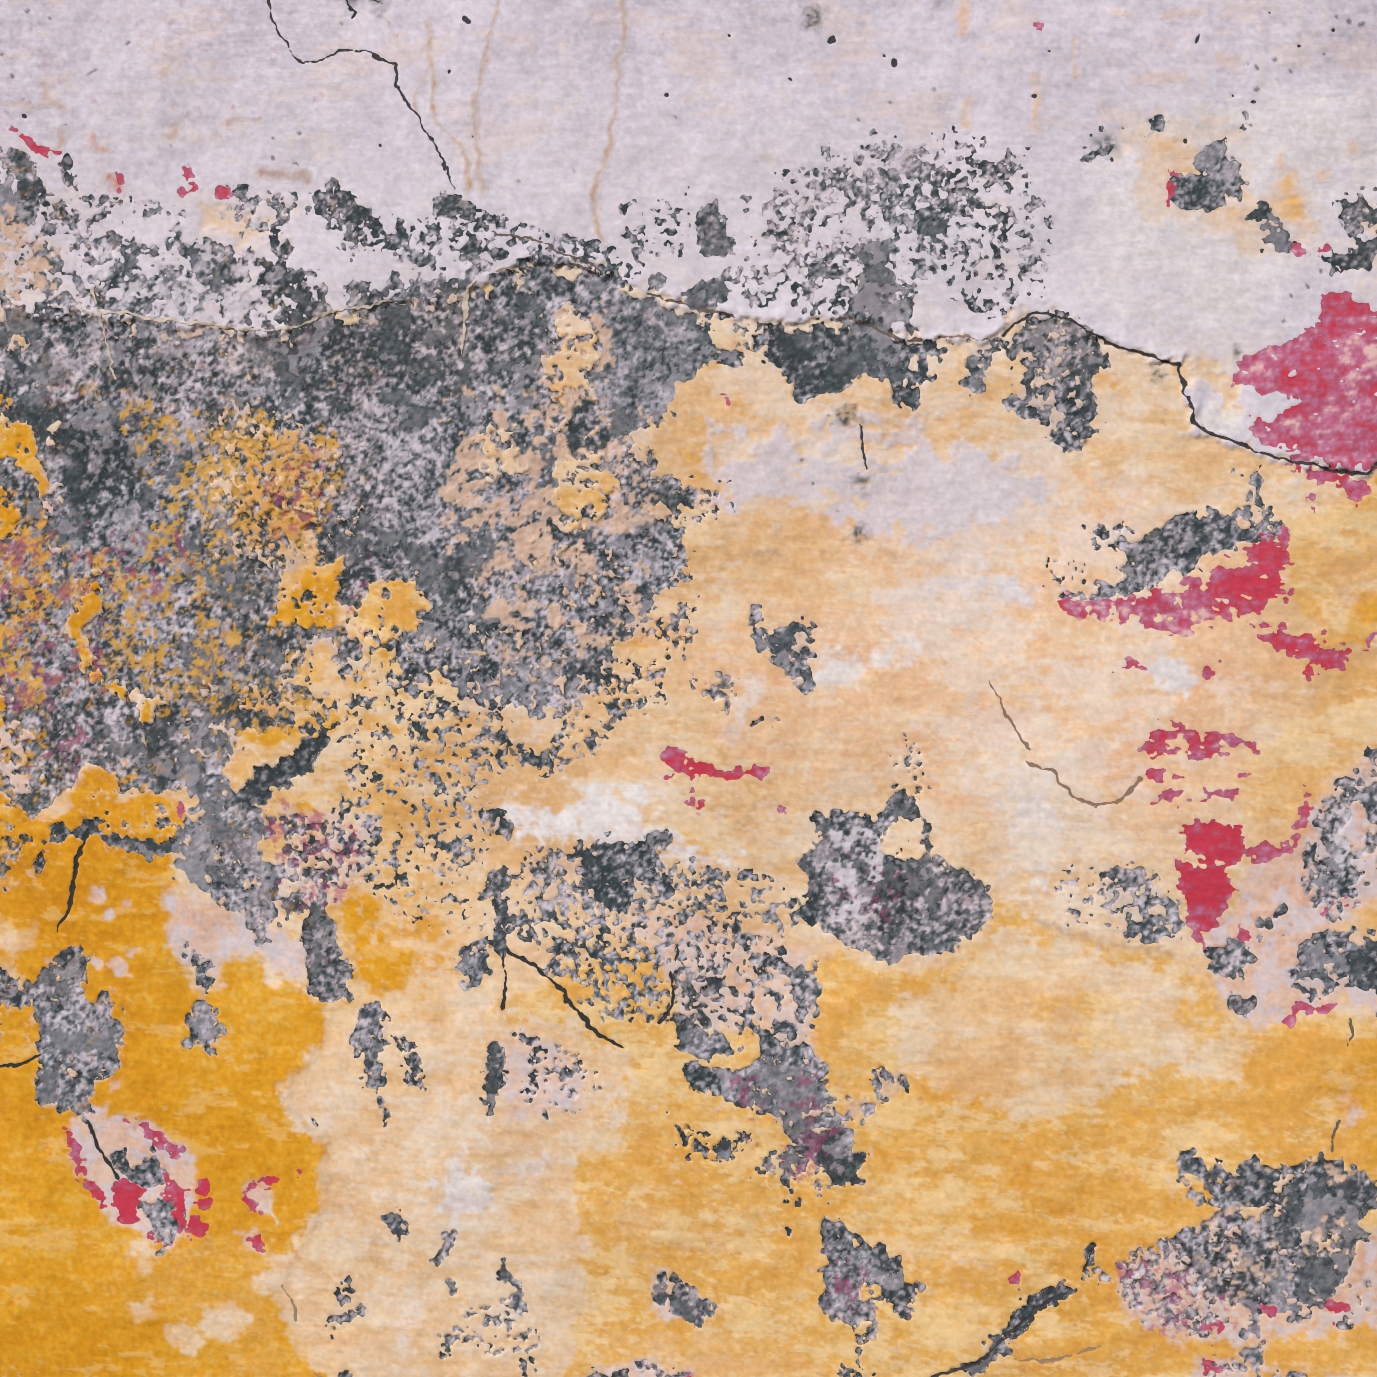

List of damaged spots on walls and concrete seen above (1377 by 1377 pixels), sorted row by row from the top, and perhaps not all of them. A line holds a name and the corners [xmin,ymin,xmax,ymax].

crack [267,0,455,189]
crack [460,229,602,354]
crack [646,293,734,317]
crack [837,311,1377,476]
peeling [1231,291,1377,513]
peeling [1290,243,1332,257]
peeling [1042,465,1377,682]
spalling [0,125,1111,1377]
peeling [1055,719,1377,1028]
crack [500,947,624,1048]
crack [931,1242,1100,1377]
spalling [949,1147,1377,1377]